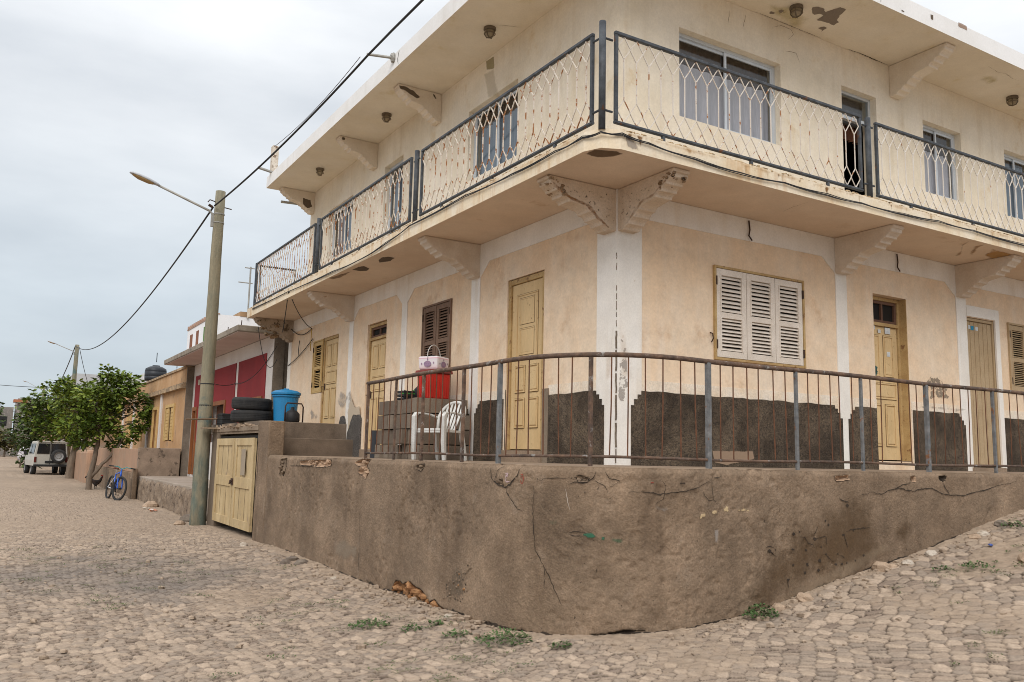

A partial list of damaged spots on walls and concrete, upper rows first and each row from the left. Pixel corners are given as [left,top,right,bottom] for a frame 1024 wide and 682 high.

peeling [812,7,846,31]
peeling [619,339,628,401]
crack [490,253,722,604]
crack [841,481,1016,502]
crack [286,520,565,635]
flaking render [392,565,473,609]
crack [766,527,961,599]
crack [654,607,766,633]